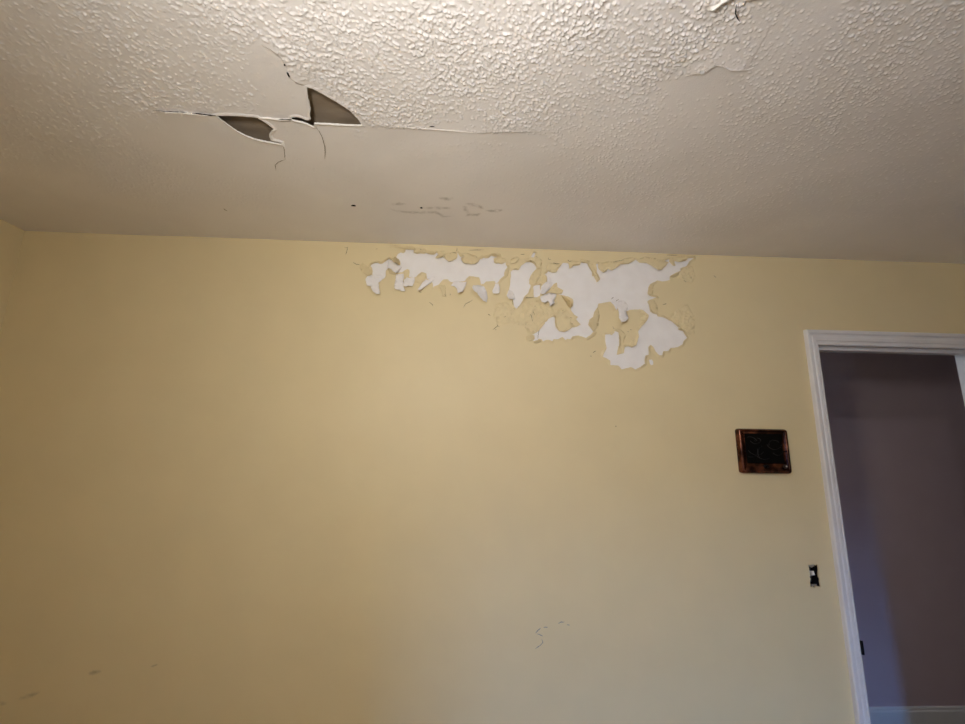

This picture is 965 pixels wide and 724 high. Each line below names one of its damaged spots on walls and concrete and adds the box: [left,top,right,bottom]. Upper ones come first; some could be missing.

crack [158,110,216,118]
crack [258,115,293,123]
crack [368,125,492,134]
peeling [345,245,696,372]